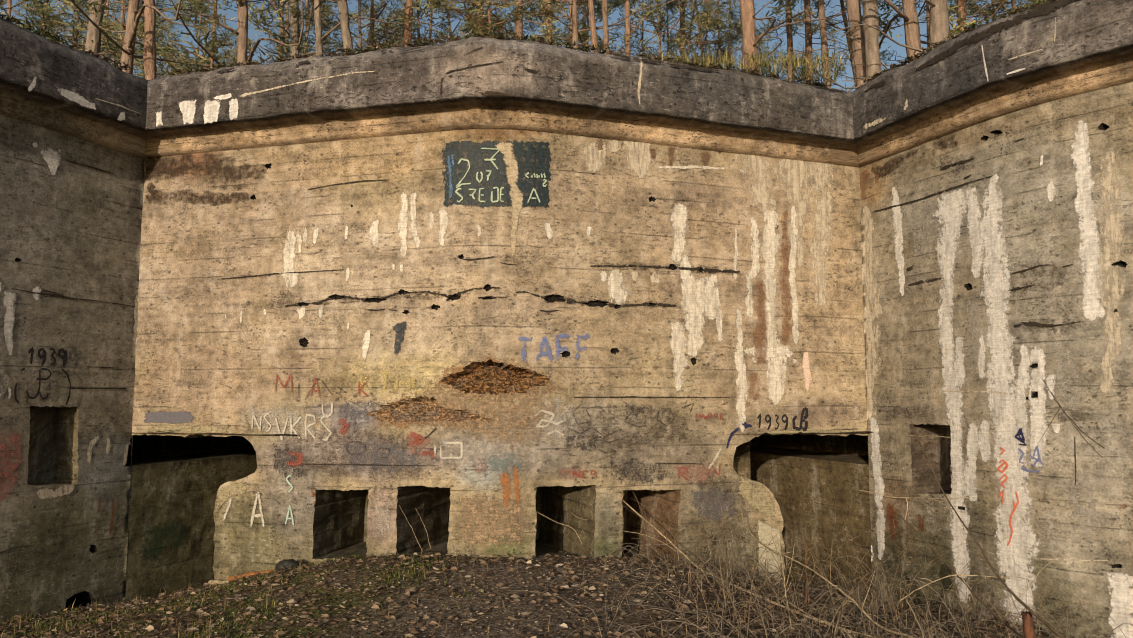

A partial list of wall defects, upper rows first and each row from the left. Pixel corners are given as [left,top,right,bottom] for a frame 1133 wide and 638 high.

leakage [144,154,266,206]
crack [217,256,676,312]
spalling [238,359,781,582]